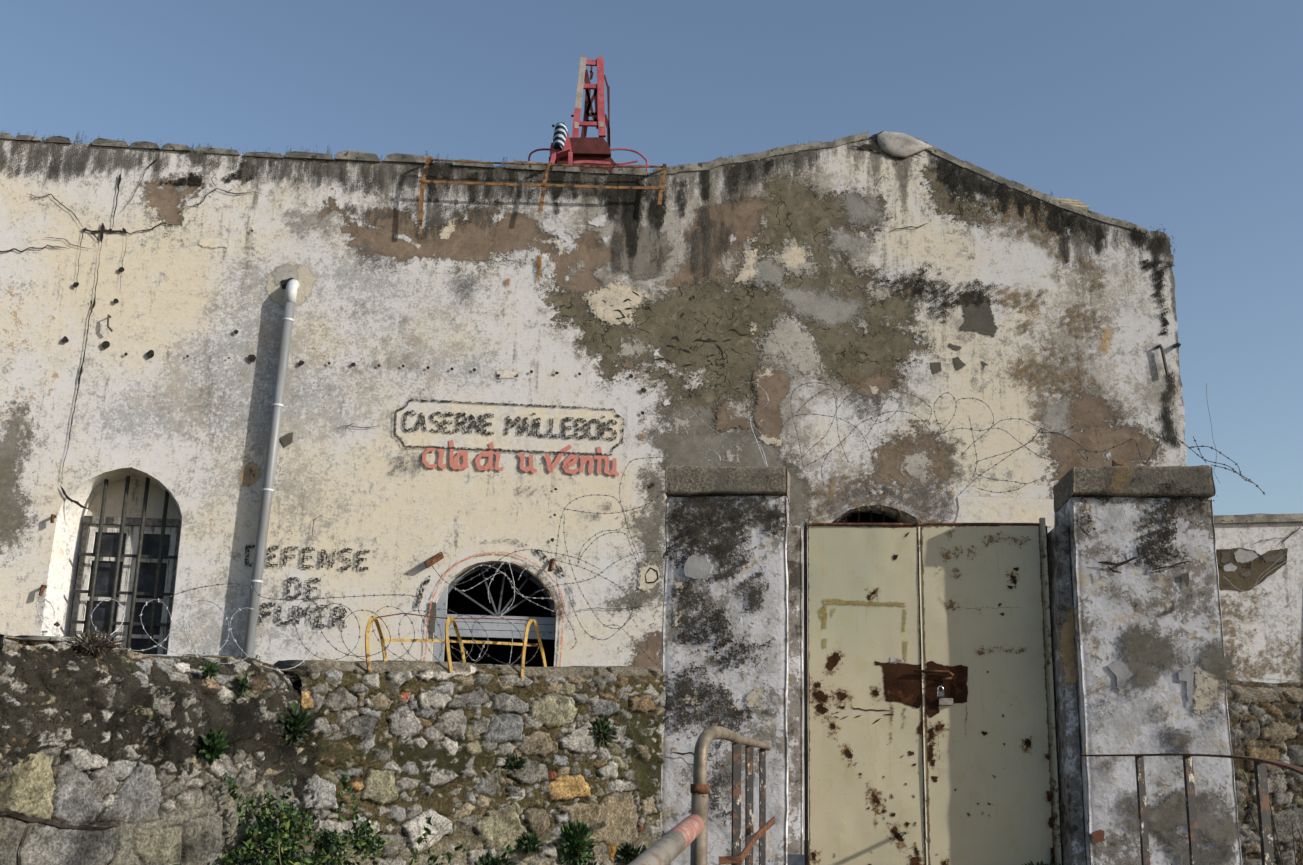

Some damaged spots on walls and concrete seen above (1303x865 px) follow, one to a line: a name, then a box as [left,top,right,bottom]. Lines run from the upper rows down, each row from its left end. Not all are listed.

peeling [126,166,217,245]
damp [0,130,820,285]
damp [931,159,1175,336]
crack [0,151,261,509]
peeling [301,160,1000,535]
damp [880,263,1002,327]
damp [1040,393,1076,438]
damp [1155,371,1182,448]
flaking render [1216,548,1288,592]
rust [807,646,950,865]
rust [1003,736,1050,760]